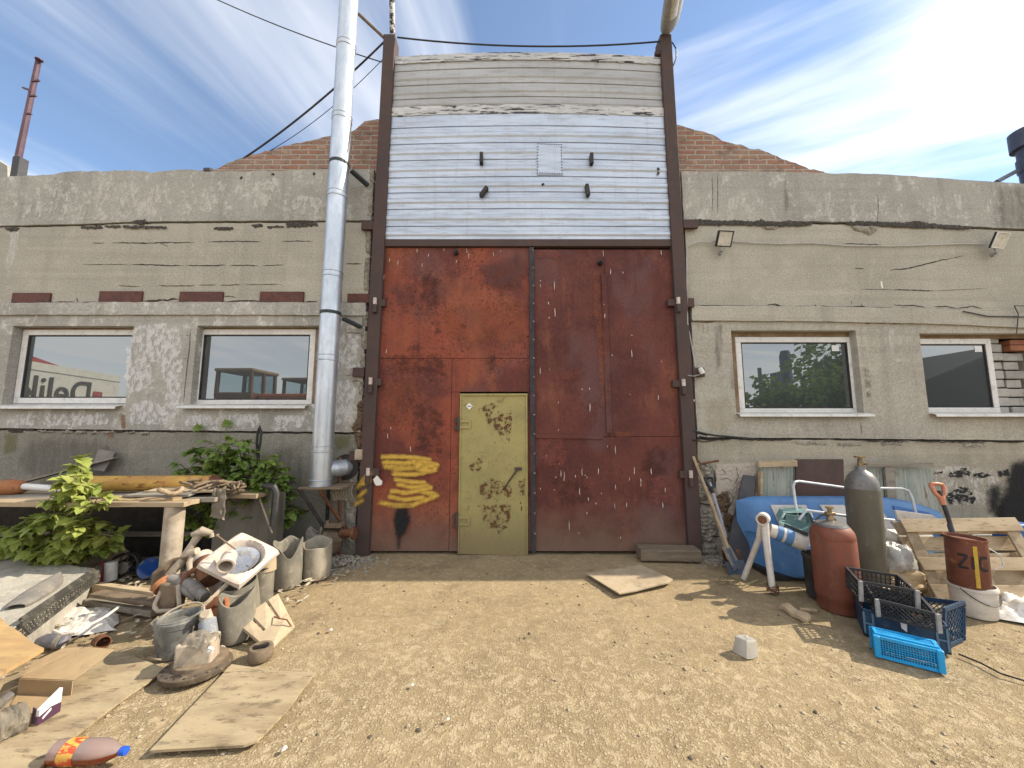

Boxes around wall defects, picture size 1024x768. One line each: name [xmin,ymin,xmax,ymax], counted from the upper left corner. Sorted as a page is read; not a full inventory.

crack [85,240,310,302]
crack [845,243,984,324]
peeling [6,304,214,435]
peeling [229,413,260,429]
peeling [274,414,306,429]
corrosion [479,402,512,443]
corrosion [479,479,525,533]
leakage [946,487,976,505]